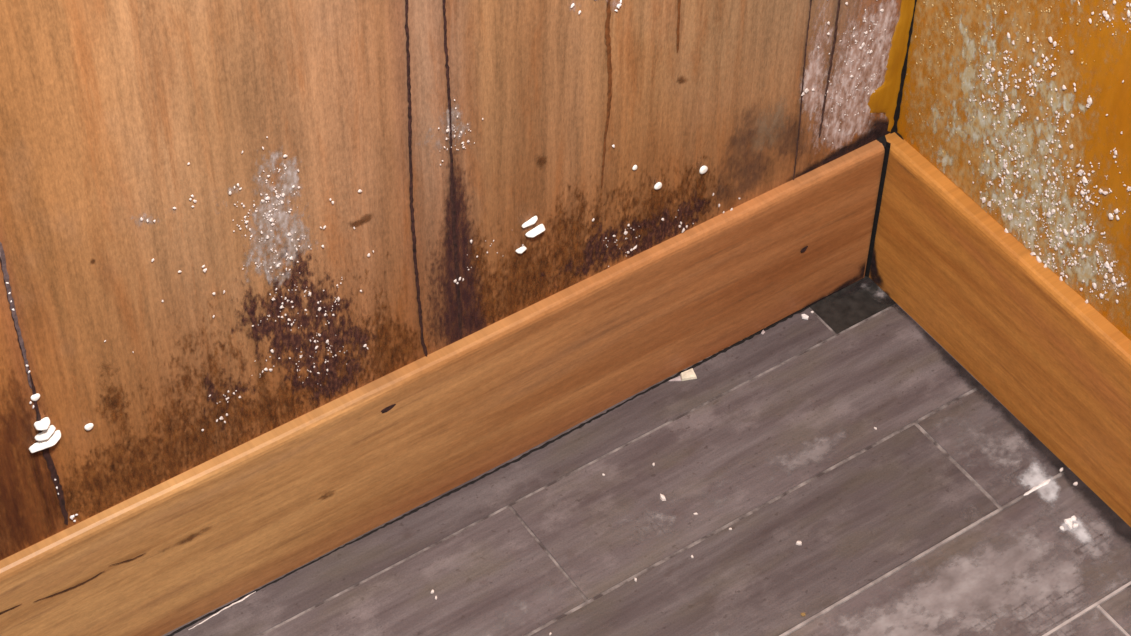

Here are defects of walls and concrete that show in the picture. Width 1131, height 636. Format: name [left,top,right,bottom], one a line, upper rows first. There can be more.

crack [0,242,78,525]
crack [0,553,145,614]
leakage [0,136,420,558]
crack [405,0,428,357]
crack [443,0,462,339]
crack [167,289,842,636]
crack [601,0,612,189]
leakage [430,99,797,344]
crack [674,0,682,53]
crack [793,0,841,180]
leakage [795,0,900,178]
crack [865,0,917,277]